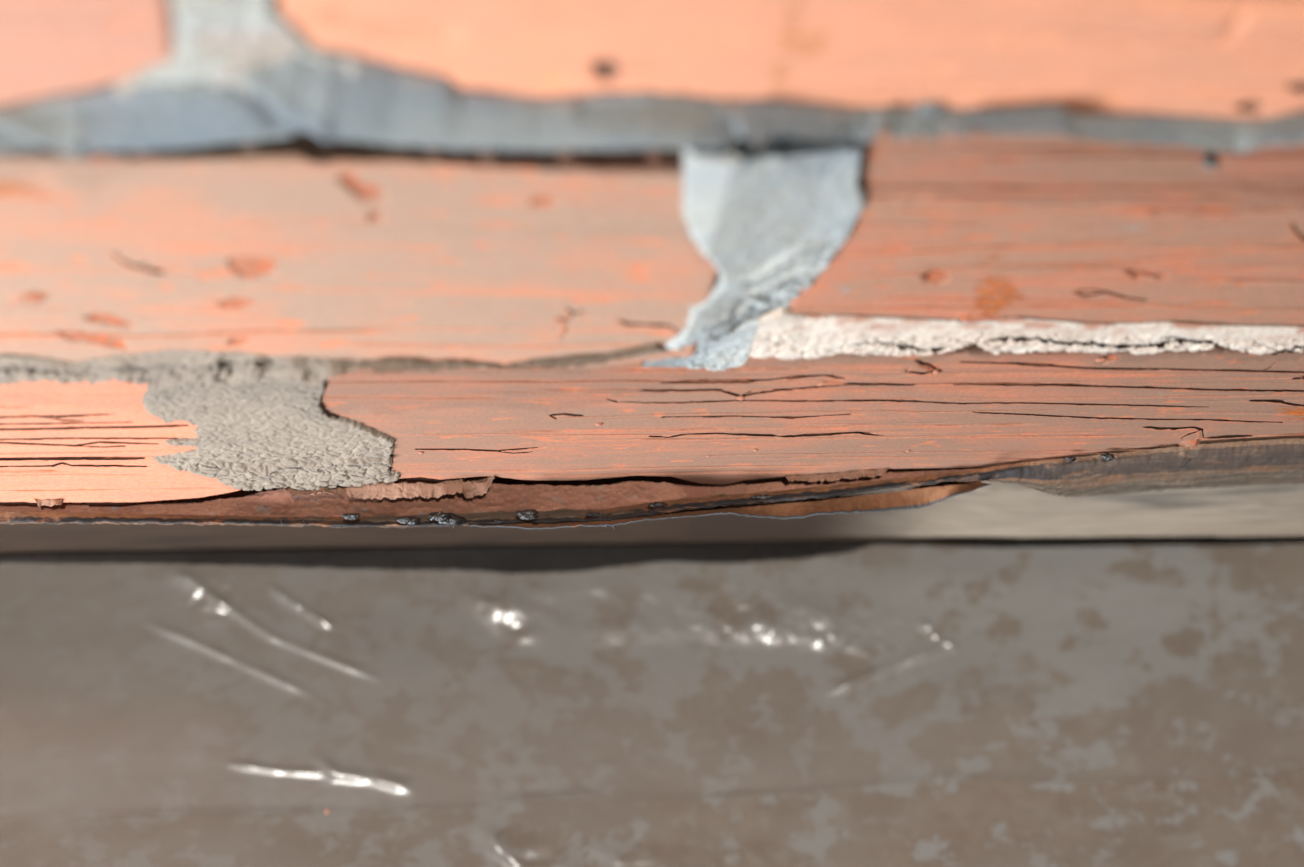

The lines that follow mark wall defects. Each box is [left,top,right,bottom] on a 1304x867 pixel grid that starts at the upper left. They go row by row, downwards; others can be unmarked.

spalling [592,59,624,81]
spalling [66,313,134,349]